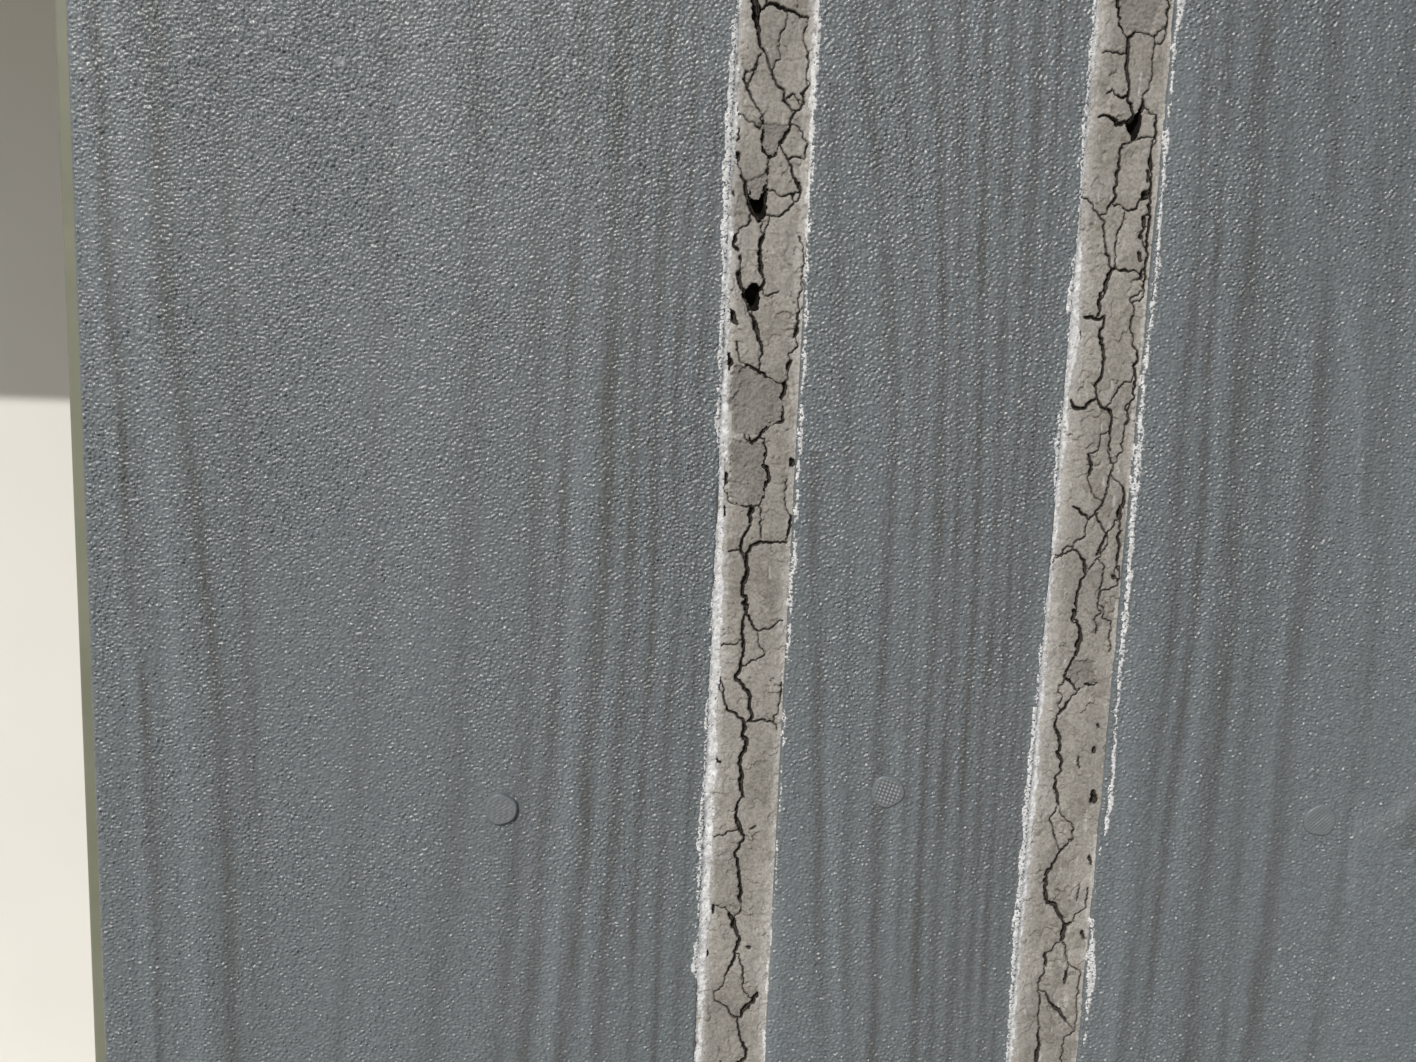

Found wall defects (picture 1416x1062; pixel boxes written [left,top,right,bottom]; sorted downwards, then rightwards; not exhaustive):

spalling [733,173,767,200]
spalling [761,124,787,156]
crack [713,0,810,1062]
spalling [723,237,810,679]
crack [1037,0,1171,1038]
peeling [1077,681,1122,865]
peeling [765,840,778,995]
peeling [1076,886,1096,1044]